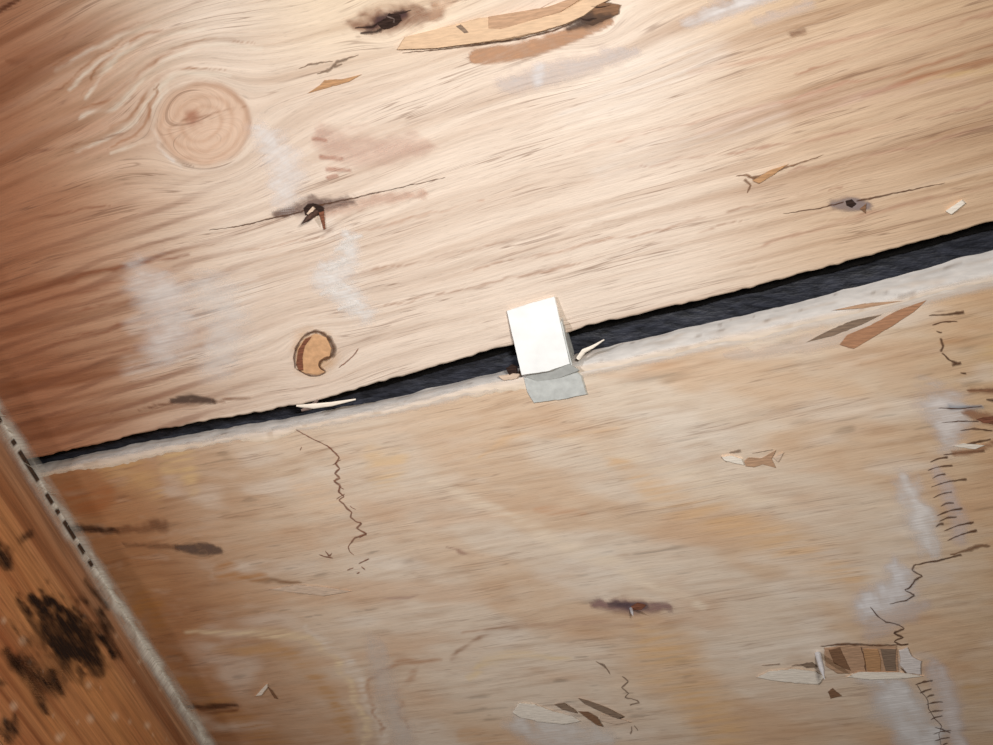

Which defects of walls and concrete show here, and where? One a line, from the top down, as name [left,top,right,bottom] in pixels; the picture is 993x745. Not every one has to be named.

peeling [488,0,580,29]
crack [296,429,368,574]
damp [0,544,11,569]
damp [5,589,116,714]
peeling [829,647,851,671]
crack [821,643,905,671]
peeling [863,649,896,671]